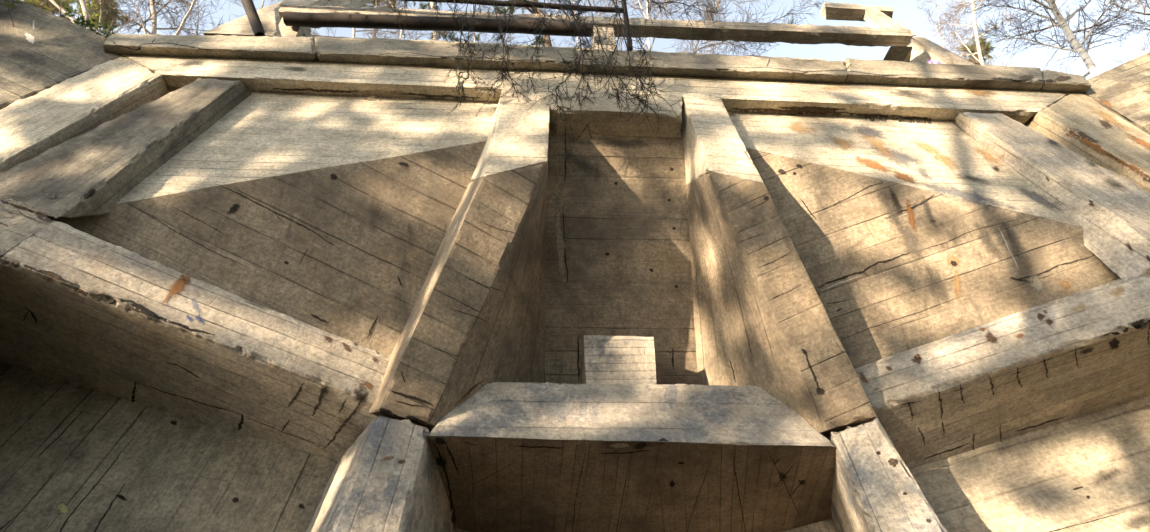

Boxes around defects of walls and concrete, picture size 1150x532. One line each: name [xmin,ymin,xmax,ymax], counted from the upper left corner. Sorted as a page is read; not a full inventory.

crack [801,348,825,394]
crack [131,362,324,447]
crack [1015,417,1063,432]
crack [925,444,967,459]